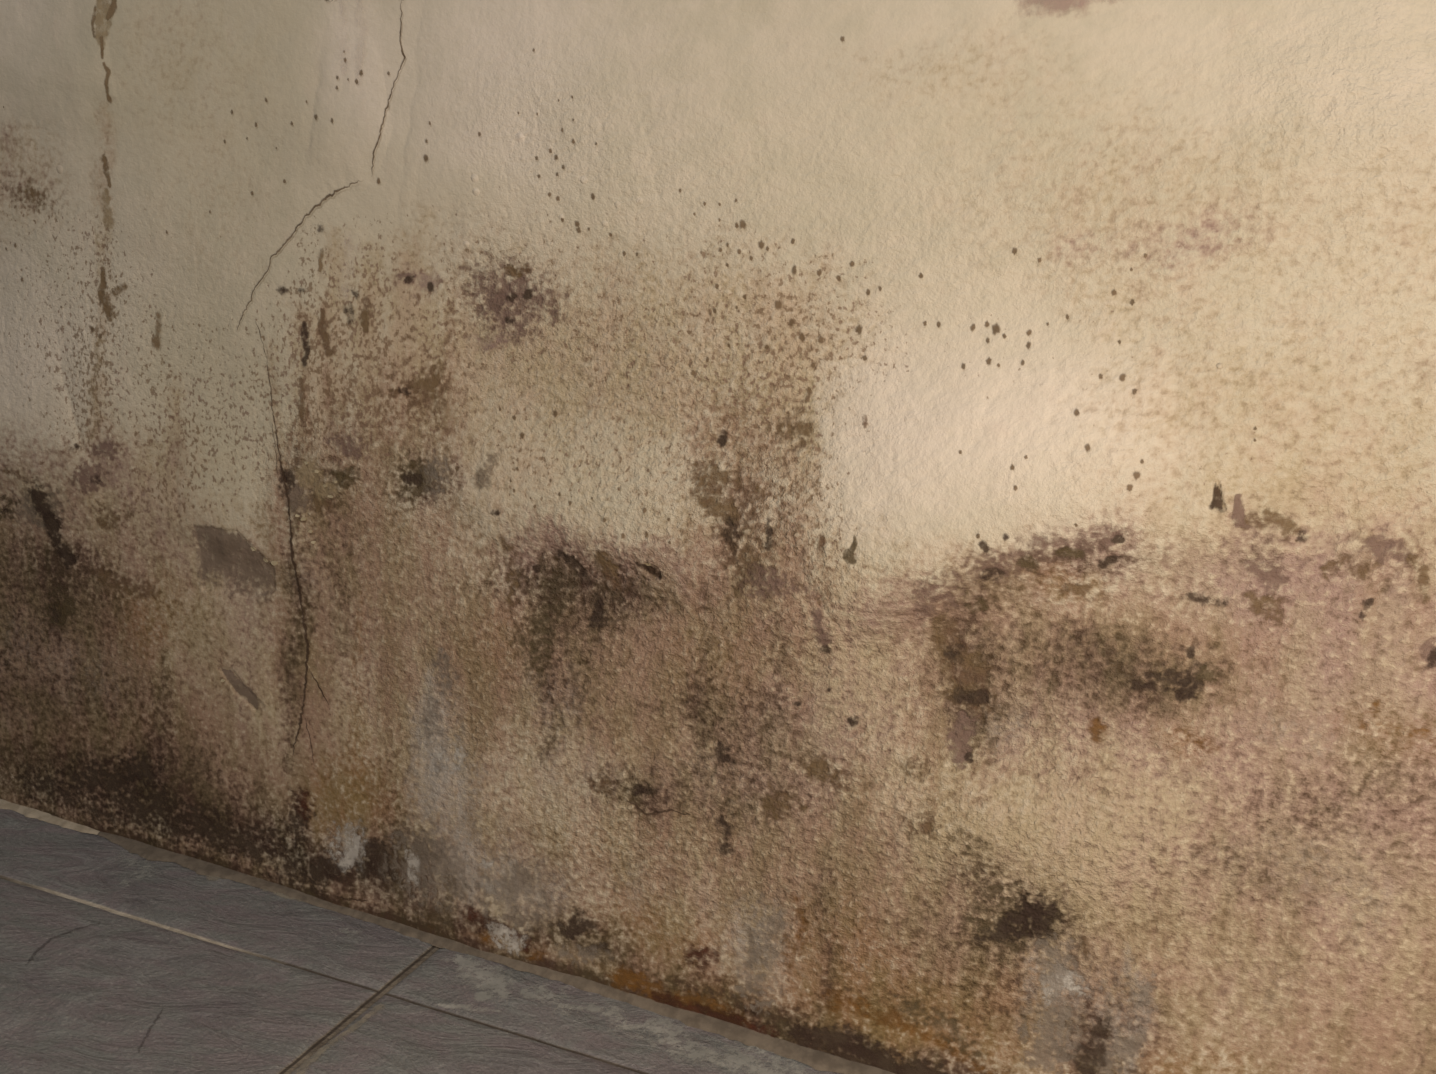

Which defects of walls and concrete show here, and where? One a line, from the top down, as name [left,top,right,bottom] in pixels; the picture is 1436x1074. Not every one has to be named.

damp [299,309,333,418]
crack [237,4,406,763]
damp [463,259,567,349]
damp [971,321,1007,367]
damp [0,470,79,569]
damp [690,462,807,597]
damp [843,536,857,564]
damp [1232,494,1305,541]
damp [913,524,1125,768]
damp [17,752,419,901]
damp [969,882,1059,947]
damp [789,1024,946,1074]